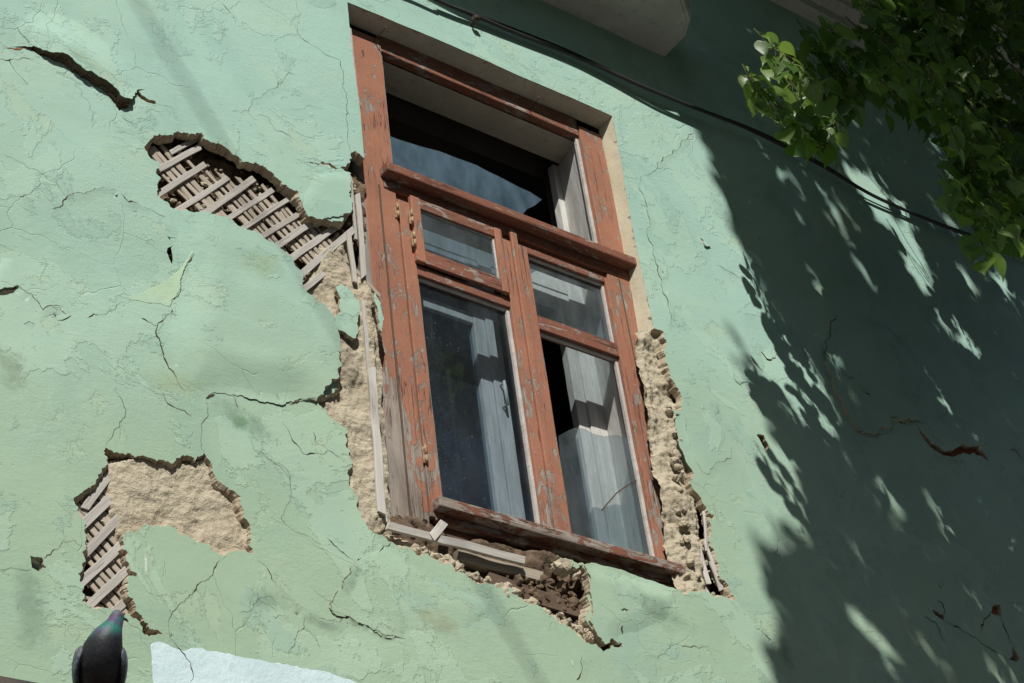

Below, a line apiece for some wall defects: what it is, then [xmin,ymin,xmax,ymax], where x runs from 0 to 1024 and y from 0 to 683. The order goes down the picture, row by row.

crack [2,29,30,85]
peeling [129,249,193,306]
crack [140,310,337,456]
spalling [148,138,595,644]
spalling [635,327,724,596]
crack [935,437,1022,458]
spalling [76,458,247,614]